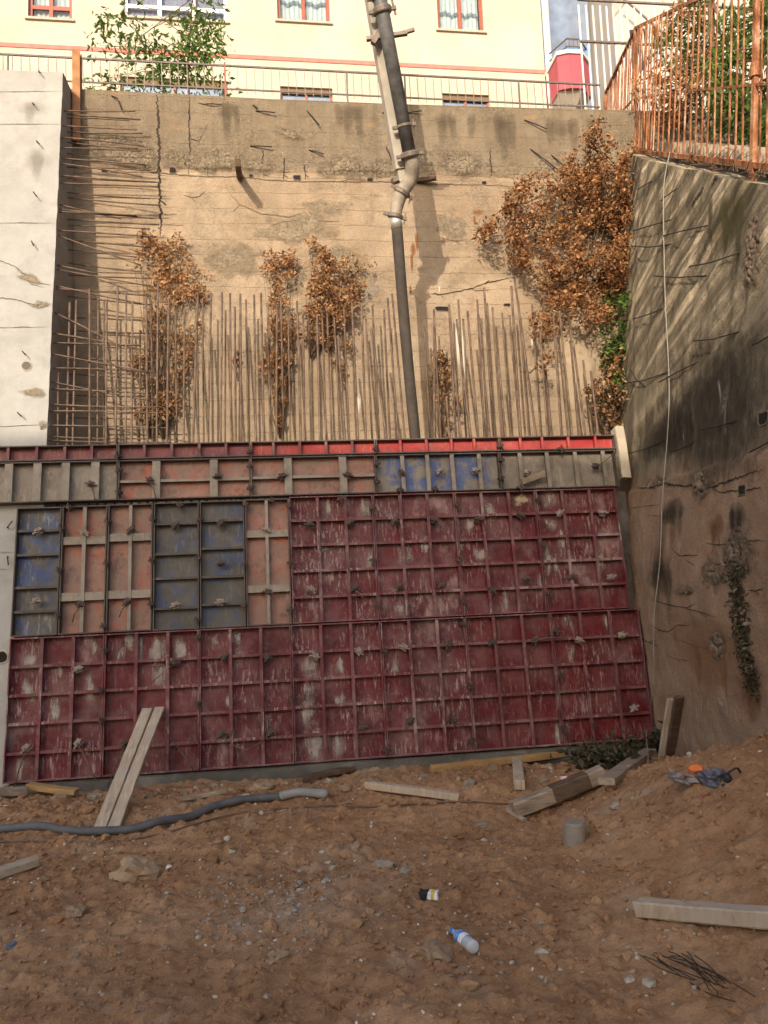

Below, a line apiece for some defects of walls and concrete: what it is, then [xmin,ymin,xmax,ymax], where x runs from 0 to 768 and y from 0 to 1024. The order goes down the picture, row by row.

crack [89,95,390,236]
crack [418,150,514,187]
spalling [24,110,406,445]
damp [663,503,681,521]
crack [633,470,761,516]